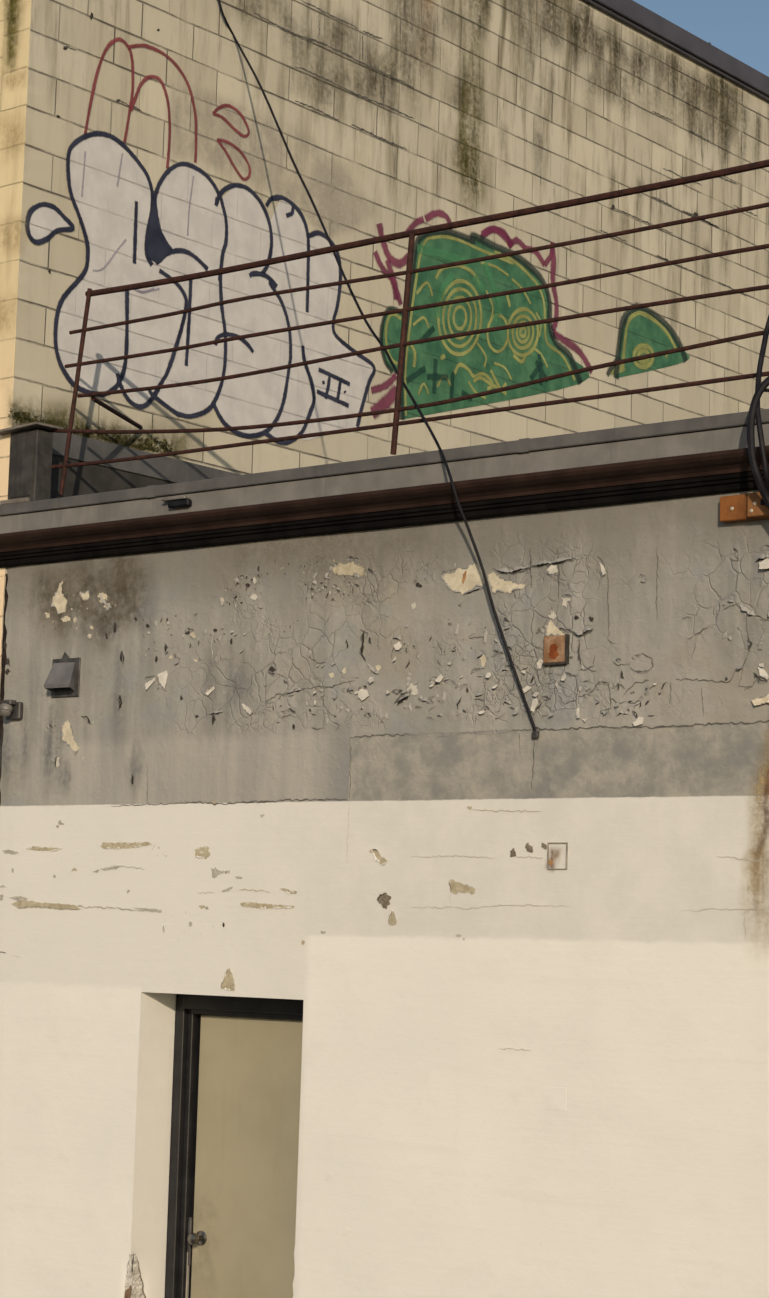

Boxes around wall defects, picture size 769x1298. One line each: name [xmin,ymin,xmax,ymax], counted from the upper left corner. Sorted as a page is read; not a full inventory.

leakage [7,0,18,62]
leakage [572,10,620,58]
peeling [44,581,116,639]
peeling [411,563,525,609]
peeling [345,617,551,724]
corrosion [549,644,559,660]
crack [114,549,769,865]
peeling [0,846,166,933]
peeling [195,846,297,910]
peeling [377,891,397,926]
peeling [510,843,547,857]
spalling [124,1254,146,1298]